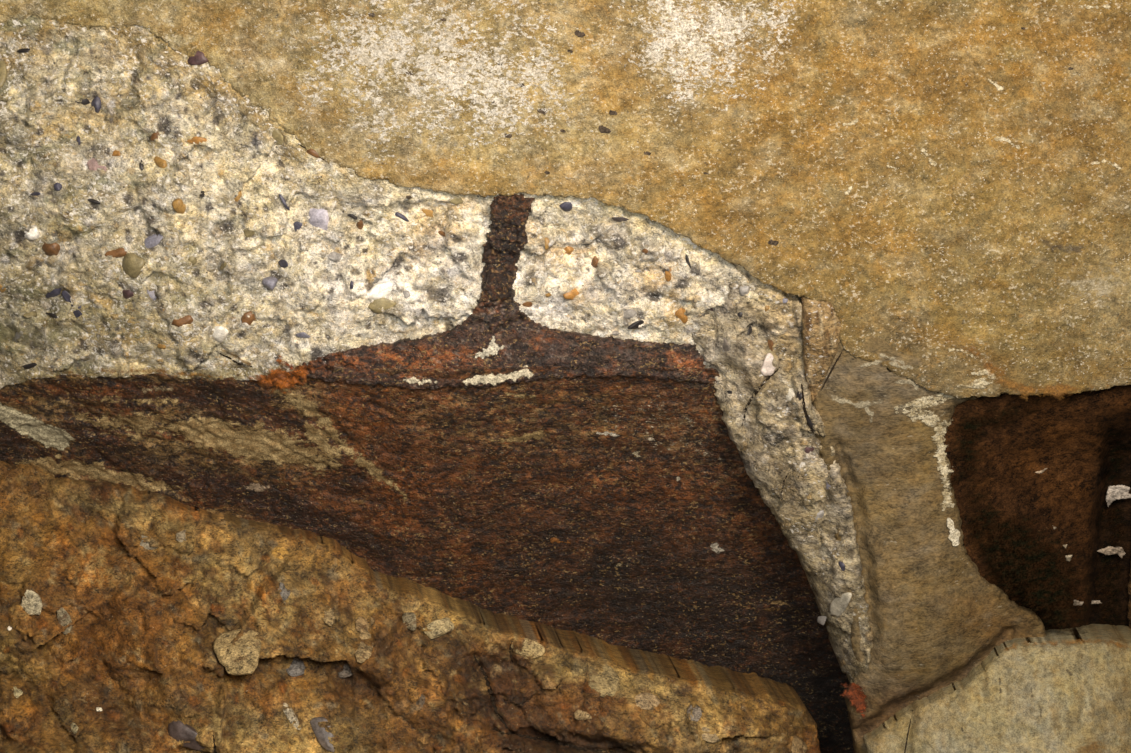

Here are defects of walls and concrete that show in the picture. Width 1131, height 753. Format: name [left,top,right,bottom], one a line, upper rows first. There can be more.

water stain [832,395,877,422]
water stain [861,348,1131,635]